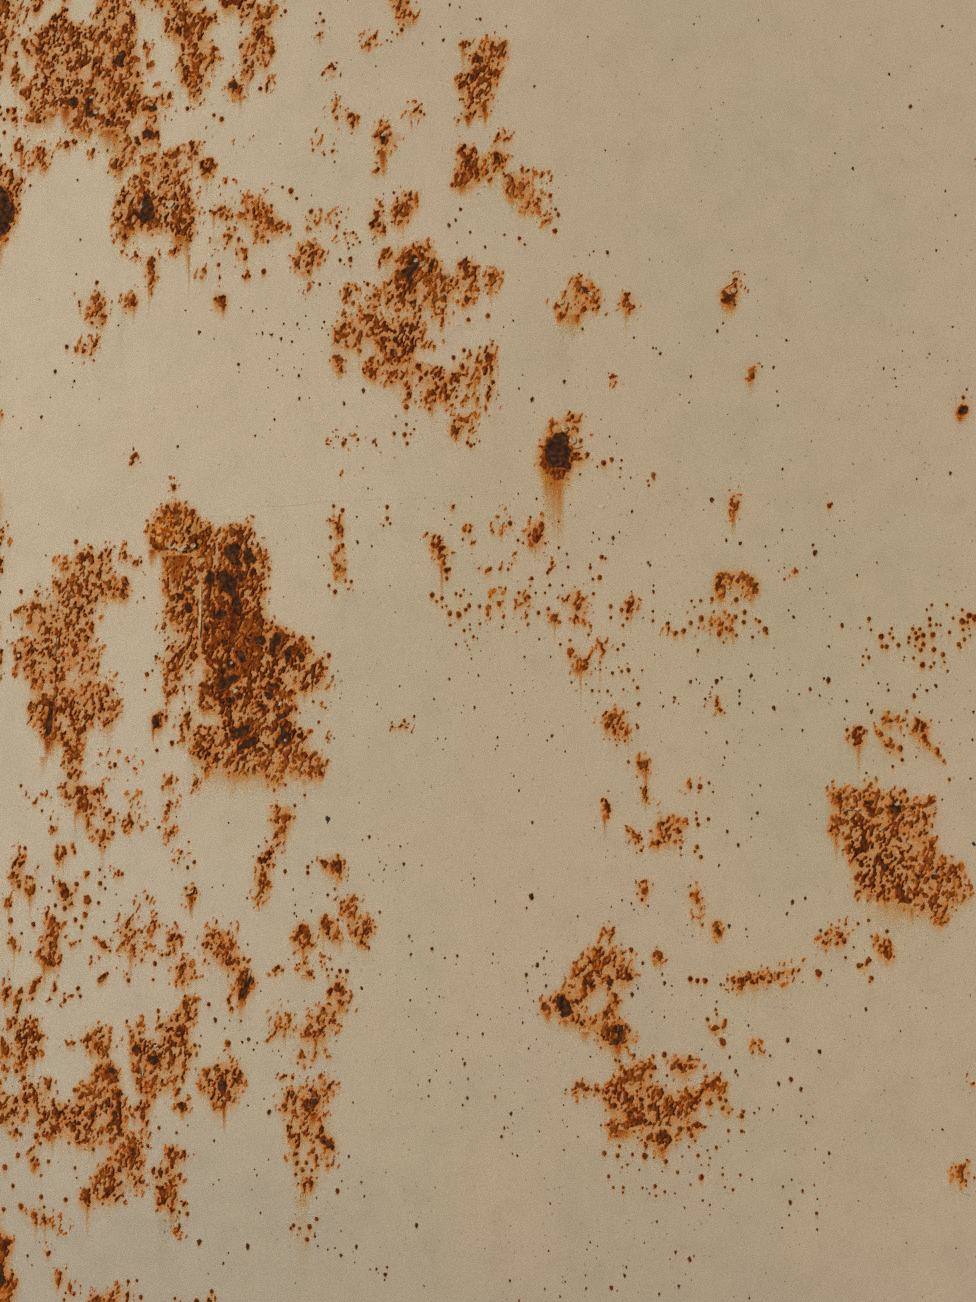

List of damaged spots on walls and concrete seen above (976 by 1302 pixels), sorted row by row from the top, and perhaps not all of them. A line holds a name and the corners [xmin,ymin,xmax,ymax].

corrosion [440,17,560,234]
corrosion [325,425,395,459]
corrosion [0,504,388,1302]
corrosion [519,772,976,1198]